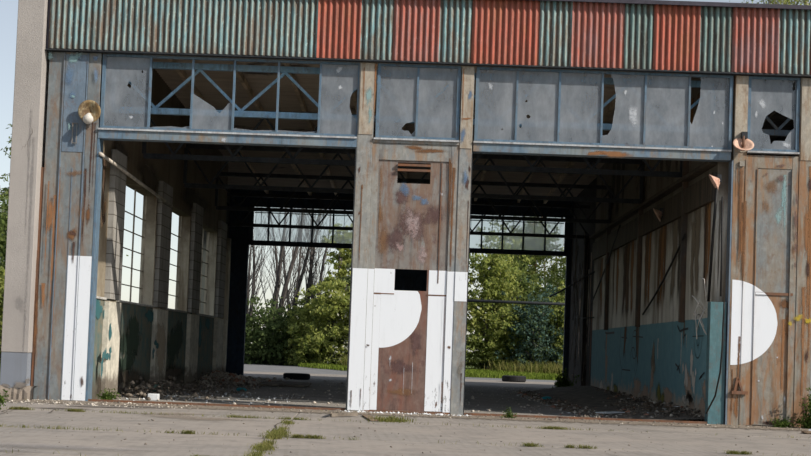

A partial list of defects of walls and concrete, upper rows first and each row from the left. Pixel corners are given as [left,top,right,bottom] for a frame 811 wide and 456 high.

corrosion [33,122,106,353]
peeling [407,214,419,238]
leakage [690,208,701,296]
corrosion [737,168,747,276]
corrosion [794,166,811,414]
leakage [118,370,144,386]
peeling [680,333,706,413]
corrosion [731,336,741,417]
corrosion [780,300,789,388]